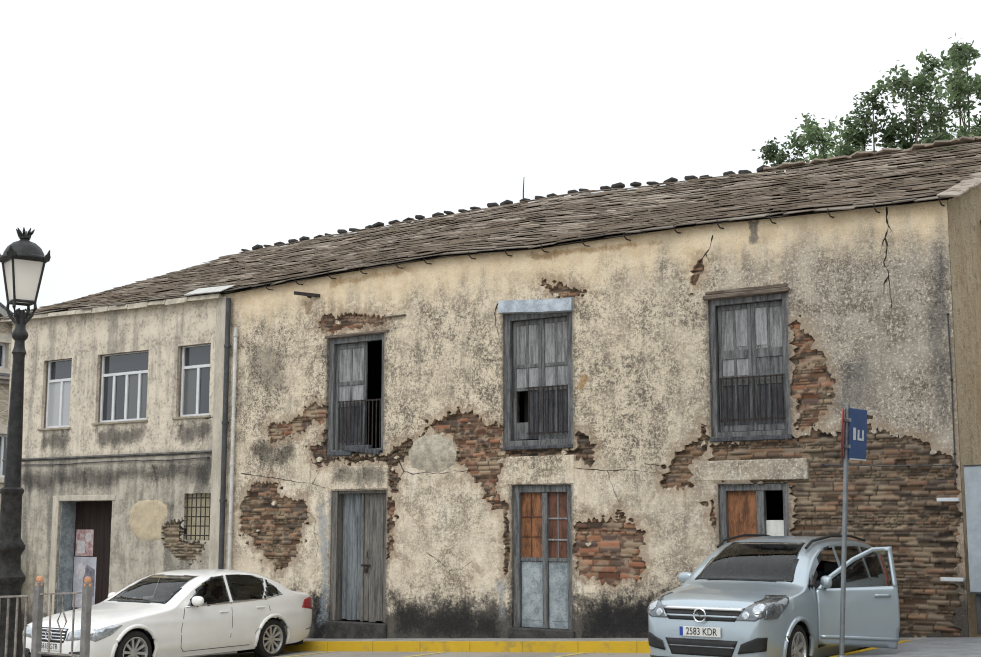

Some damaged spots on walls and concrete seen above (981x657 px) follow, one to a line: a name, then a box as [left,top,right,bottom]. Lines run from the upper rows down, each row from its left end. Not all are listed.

spalling [540,280,587,298]
spalling [688,259,704,295]
crack [880,205,892,308]
spalling [320,313,387,334]
spalling [268,396,597,574]
spalling [661,315,963,637]
flaking render [128,499,207,565]
spalling [238,481,309,572]
spalling [574,510,650,588]
damp [397,602,496,638]
damp [582,589,665,638]